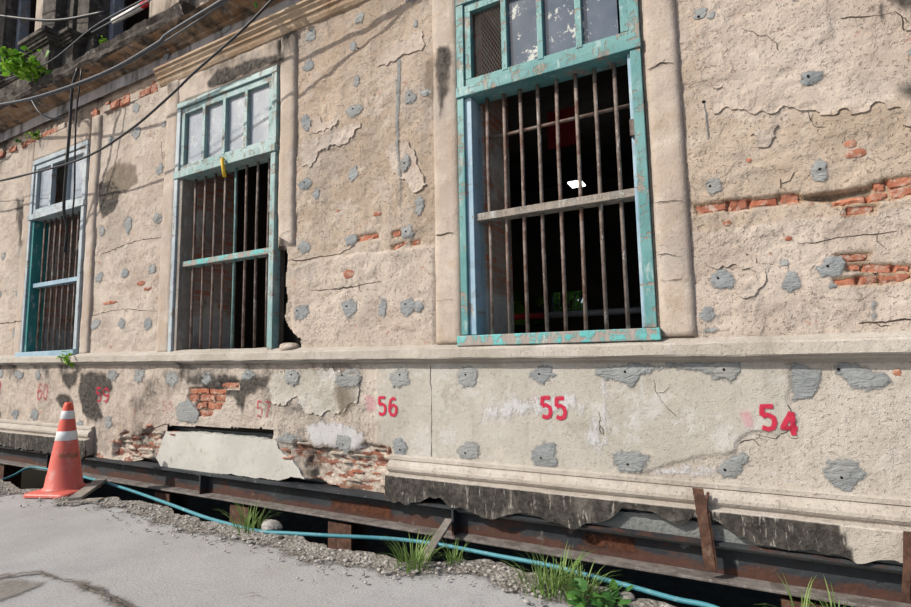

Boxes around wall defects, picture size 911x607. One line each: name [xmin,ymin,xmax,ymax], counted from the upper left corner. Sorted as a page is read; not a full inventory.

crack [841,11,910,30]
water stain [425,47,450,106]
water stain [97,163,137,217]
flaking render [696,177,911,226]
crack [800,231,894,247]
flaking render [834,254,910,286]
flaking render [279,250,302,351]
crack [859,318,911,327]
water stain [56,372,112,422]
flaking render [269,368,362,416]
corrosion [331,500,392,518]
crack [0,570,135,607]